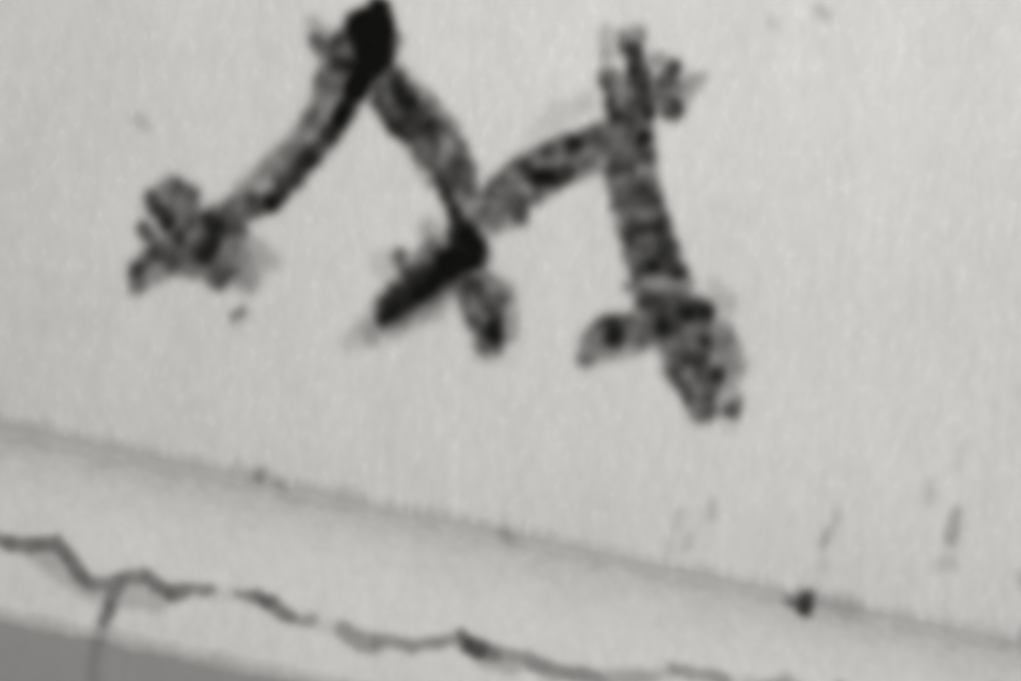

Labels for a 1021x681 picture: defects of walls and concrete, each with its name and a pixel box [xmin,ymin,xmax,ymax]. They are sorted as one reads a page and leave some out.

crack [164,589,176,597]
crack [259,597,274,606]
crack [460,635,492,658]